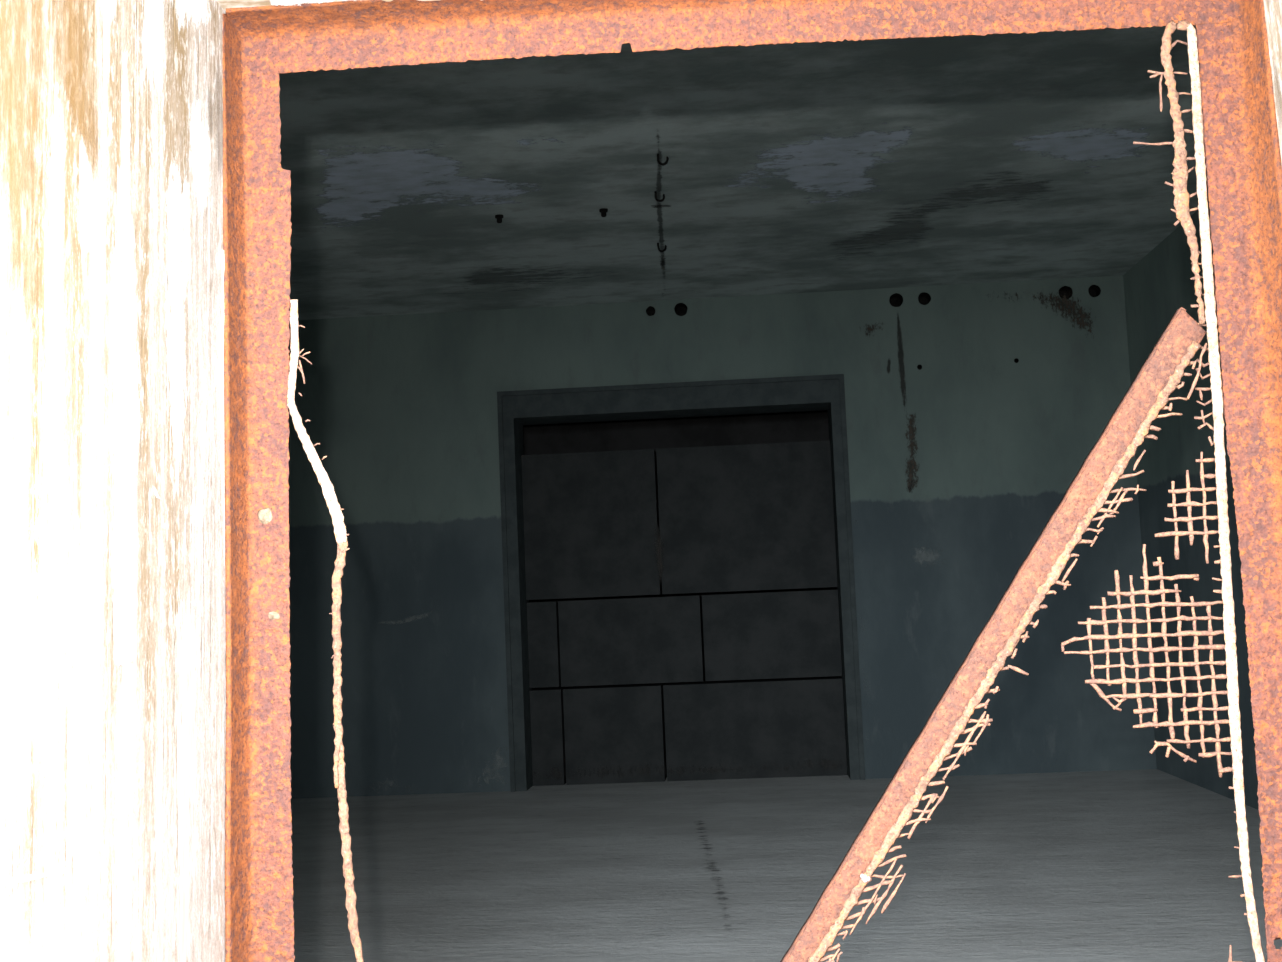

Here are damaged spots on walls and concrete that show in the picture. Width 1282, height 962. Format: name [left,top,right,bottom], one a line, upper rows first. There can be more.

damp [0,0,143,492]
damp [163,100,211,490]
damp [217,305,225,569]
rust [257,508,273,524]
damp [151,598,204,962]